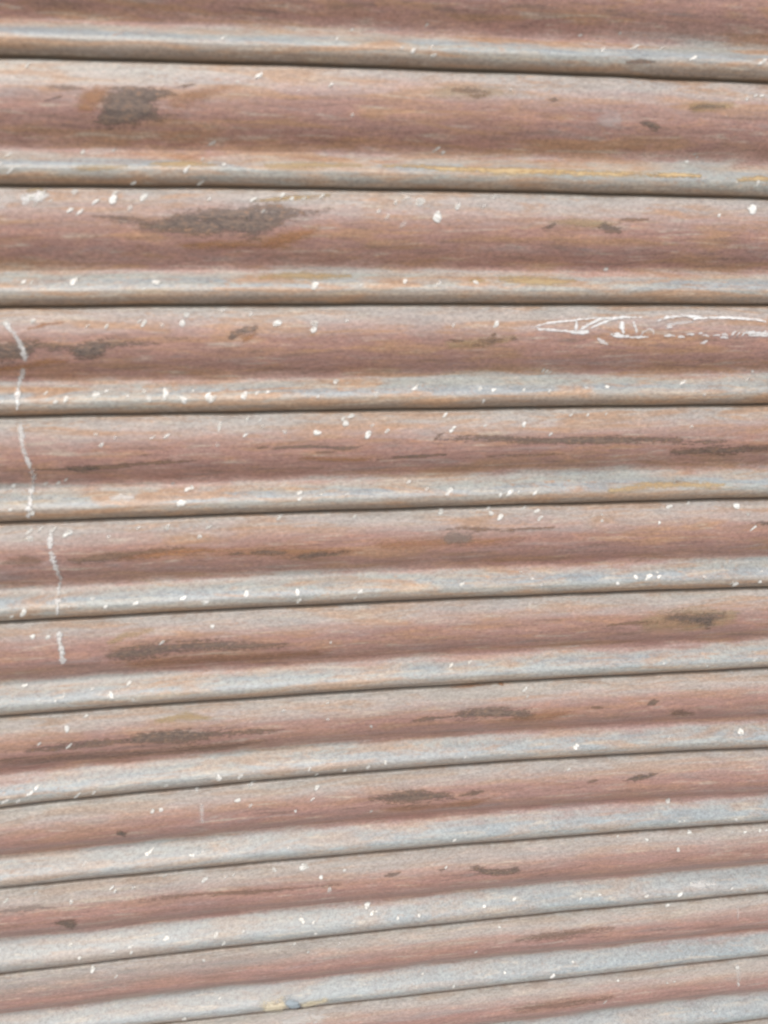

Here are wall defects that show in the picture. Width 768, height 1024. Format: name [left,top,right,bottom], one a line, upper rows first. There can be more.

corrosion [44,84,195,130]
corrosion [139,195,328,249]
corrosion [0,323,158,371]
corrosion [608,608,726,629]
corrosion [105,638,309,665]
corrosion [27,713,281,752]
corrosion [413,706,533,722]
corrosion [369,789,483,805]